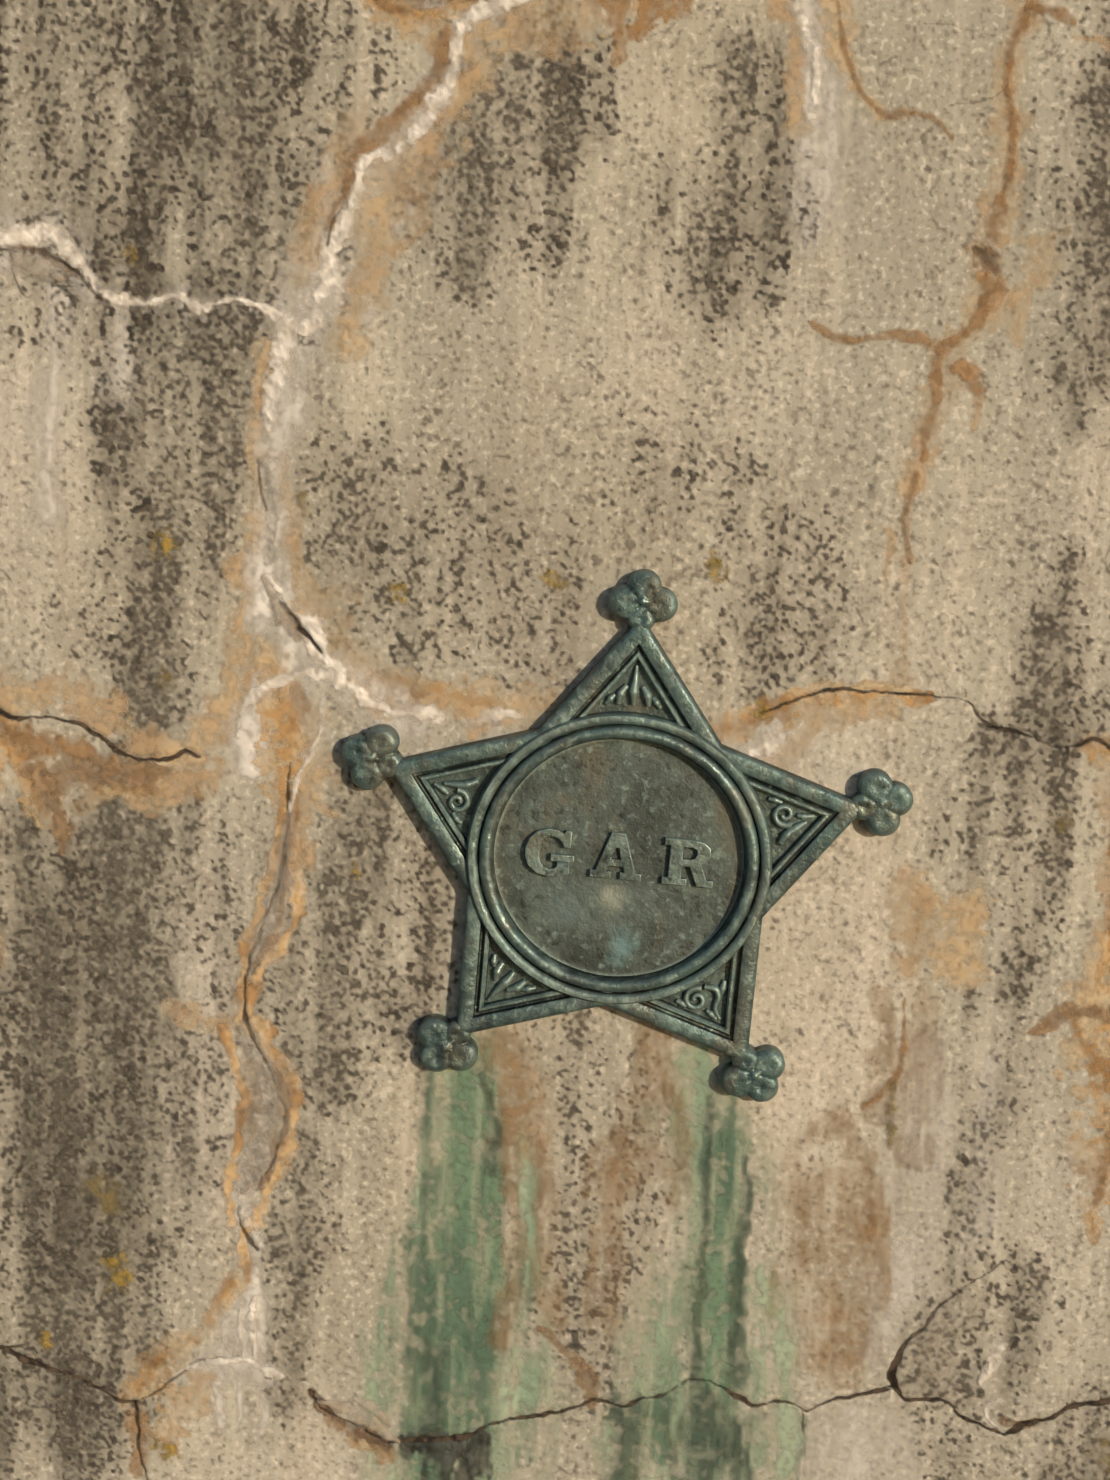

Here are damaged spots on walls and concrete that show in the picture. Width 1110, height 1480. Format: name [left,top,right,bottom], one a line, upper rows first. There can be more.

rust [304,0,545,360]
damp [651,0,837,341]
rust [891,258,1047,516]
crack [0,708,200,762]
rust [0,340,338,1307]
damp [0,0,619,1480]
crack [765,687,1110,750]
damp [898,539,1110,1021]
rust [1028,884,1110,1245]
crack [0,1345,222,1480]
damp [364,1010,801,1480]
crack [308,1260,1110,1443]